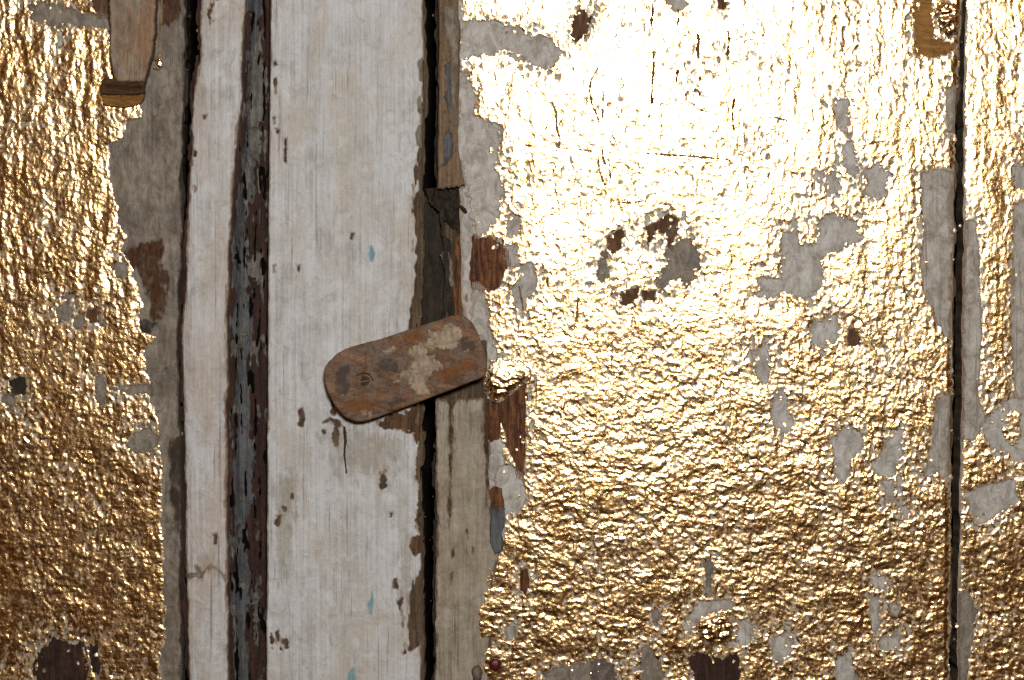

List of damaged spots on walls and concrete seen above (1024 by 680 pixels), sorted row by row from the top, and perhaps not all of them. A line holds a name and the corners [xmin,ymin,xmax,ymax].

peeling [458,18,563,363]
peeling [823,98,889,200]
peeling [110,261,128,279]
peeling [596,229,625,283]
peeling [620,213,702,306]
peeling [753,213,864,299]
peeling [920,163,1024,480]
peeling [830,425,864,483]
peeling [32,636,101,680]